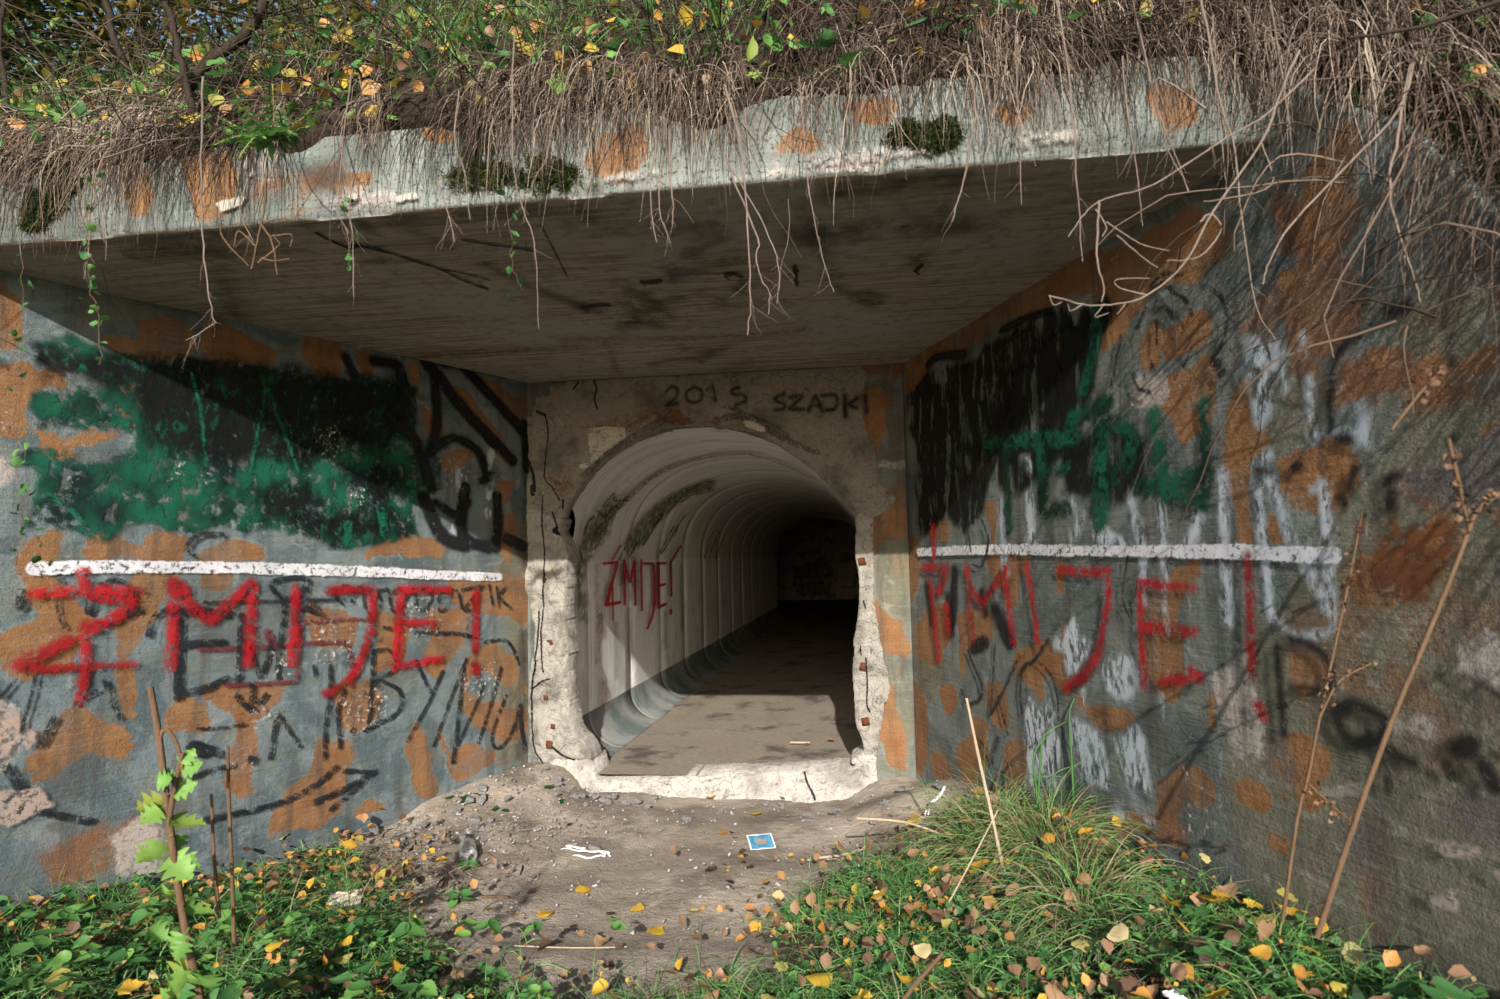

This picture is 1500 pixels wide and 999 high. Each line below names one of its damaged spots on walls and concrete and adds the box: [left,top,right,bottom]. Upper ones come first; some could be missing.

crack [315,225,567,290]
spalling [525,365,897,803]